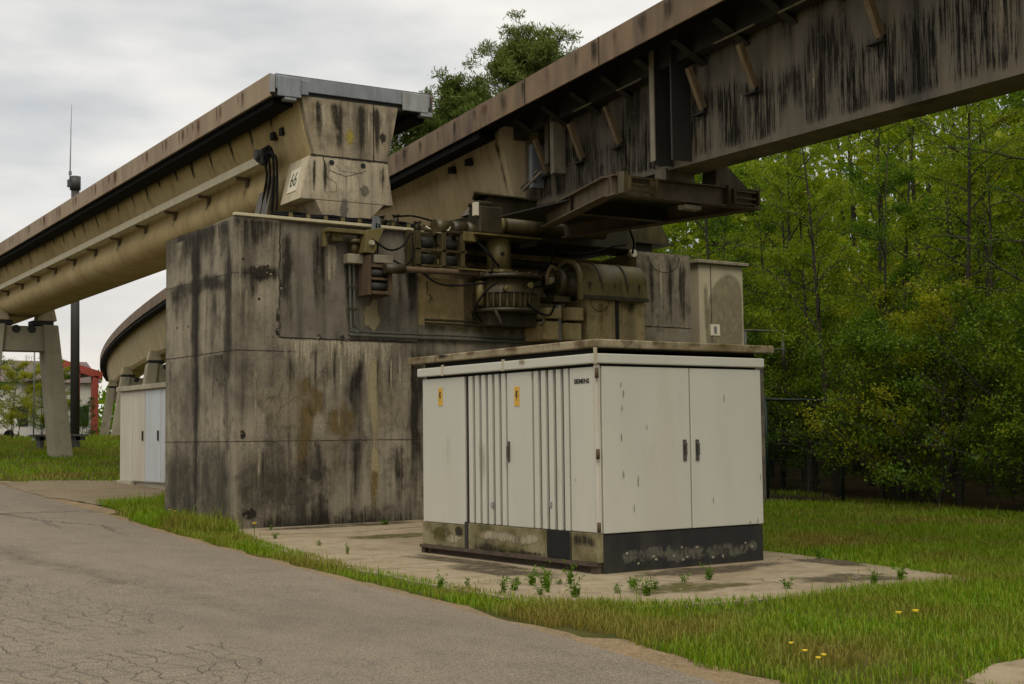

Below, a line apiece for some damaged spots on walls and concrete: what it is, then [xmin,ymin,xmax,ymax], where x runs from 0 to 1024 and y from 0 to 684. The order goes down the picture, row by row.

water stain [316,101,386,148]
water stain [722,84,775,142]
water stain [805,51,826,119]
water stain [842,26,938,111]
water stain [951,0,1018,76]
water stain [313,160,327,187]
water stain [313,235,352,306]
water stain [399,248,418,313]
water stain [169,219,291,444]
water stain [264,340,423,528]